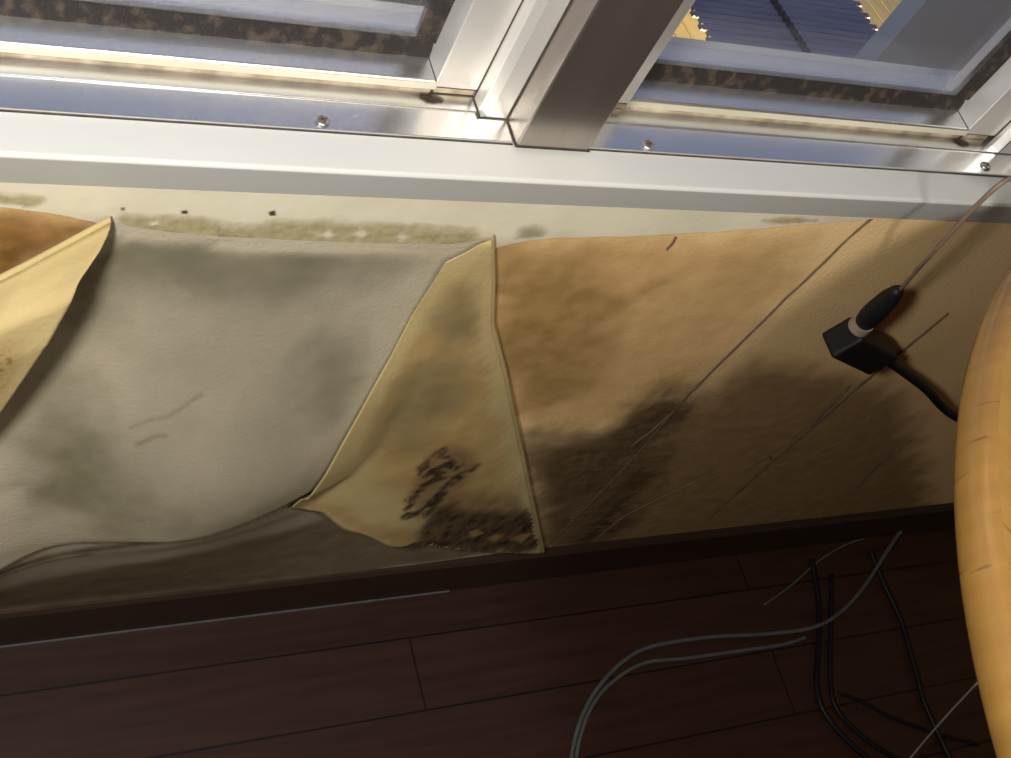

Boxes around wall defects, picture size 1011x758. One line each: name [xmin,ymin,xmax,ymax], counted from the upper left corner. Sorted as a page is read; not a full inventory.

water stain [0,374,919,614]